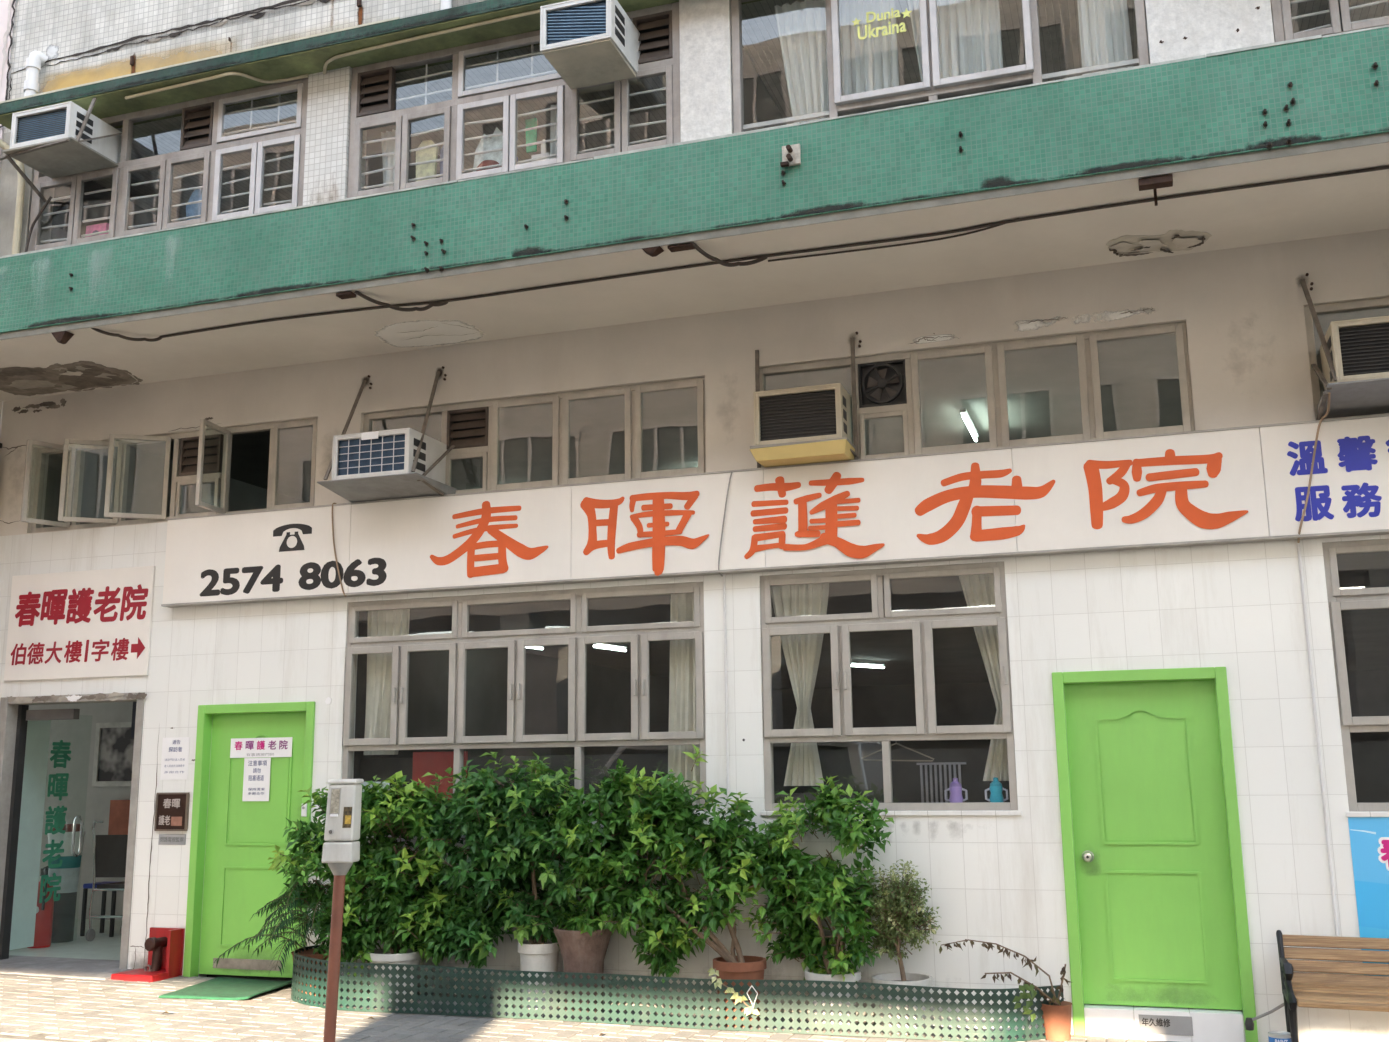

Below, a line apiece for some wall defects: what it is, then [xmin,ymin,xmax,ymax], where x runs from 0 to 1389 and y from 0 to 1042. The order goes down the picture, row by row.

peeling [1106,230,1212,257]
spalling [0,361,143,414]